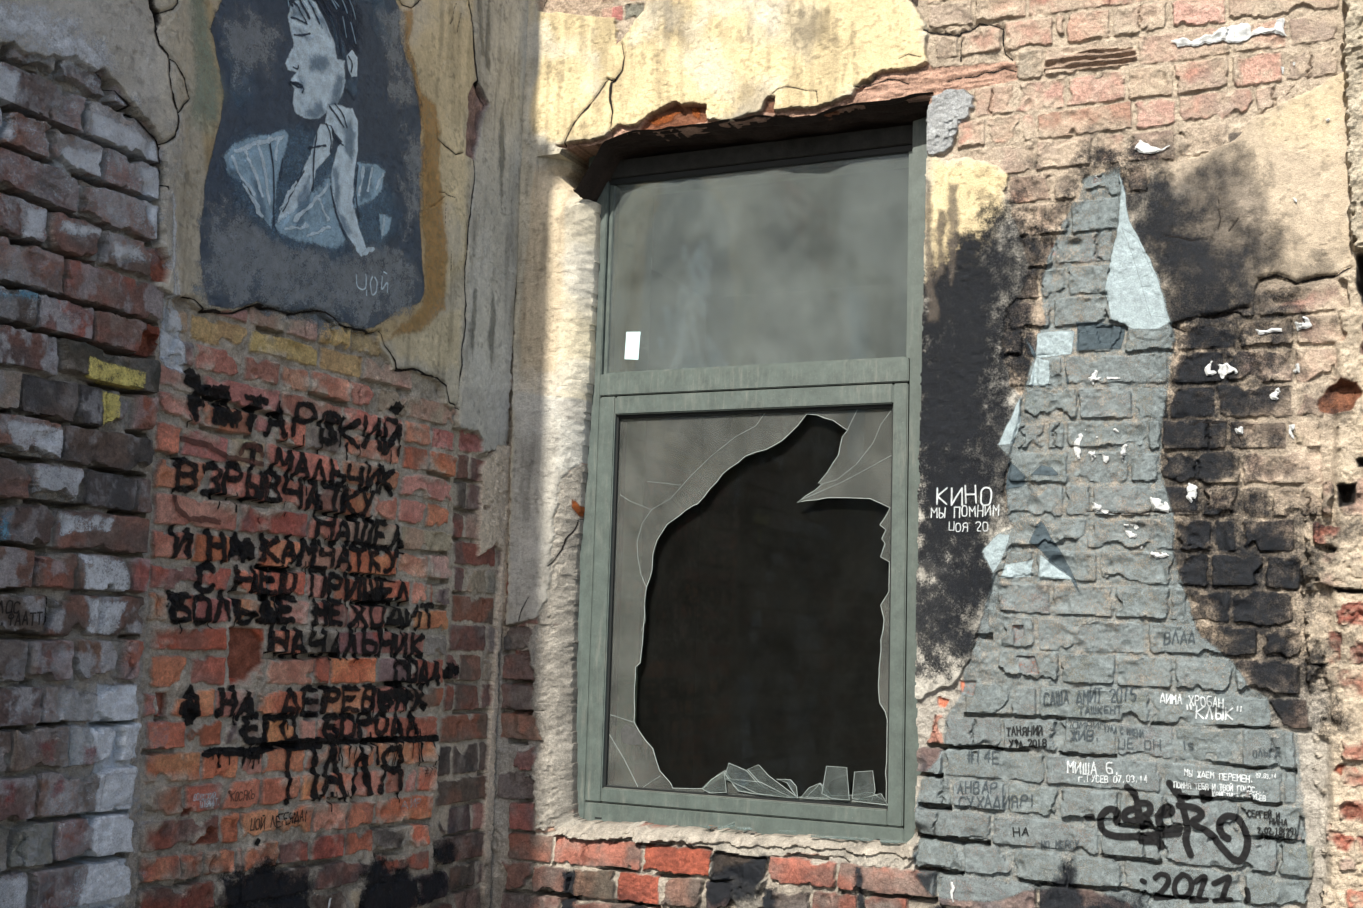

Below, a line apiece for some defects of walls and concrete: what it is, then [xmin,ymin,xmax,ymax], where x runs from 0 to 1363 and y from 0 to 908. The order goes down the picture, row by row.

spalling [537,0,614,17]
peeling [1171,18,1287,47]
spalling [1044,46,1139,70]
crack [564,43,625,147]
rust [648,109,700,125]
peeling [1135,140,1170,154]
spalling [145,247,172,284]
spalling [125,330,159,358]